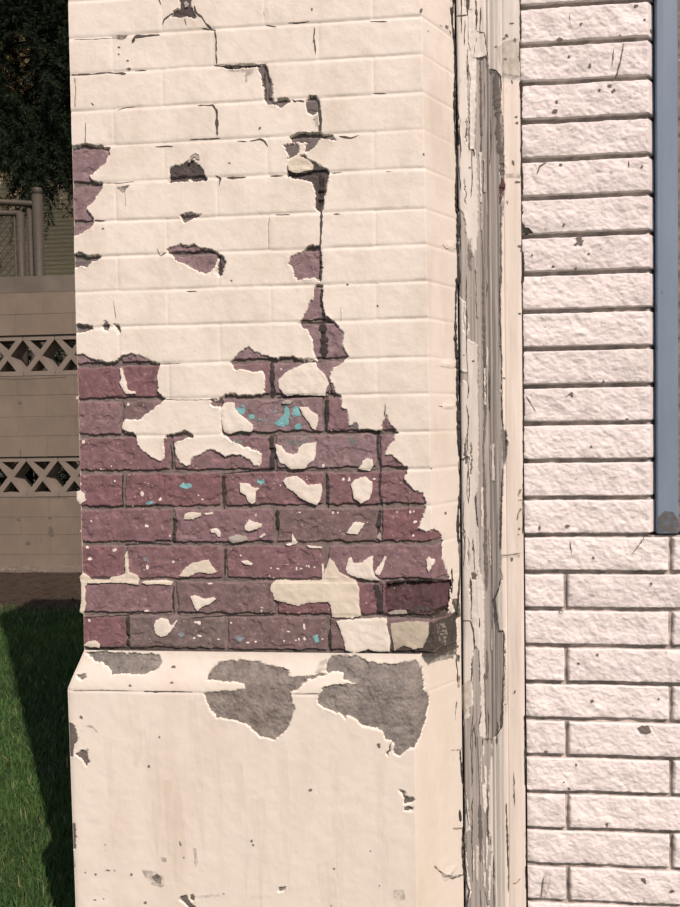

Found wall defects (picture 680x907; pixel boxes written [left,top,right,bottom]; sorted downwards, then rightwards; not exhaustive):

peeling [468,9,516,228]
peeling [73,144,110,236]
peeling [169,160,207,183]
peeling [180,213,199,223]
peeling [284,133,335,211]
crack [317,206,338,280]
peeling [472,347,488,405]
peeling [75,244,457,756]
peeling [468,487,491,565]
peeling [471,573,501,648]
peeling [473,836,493,907]